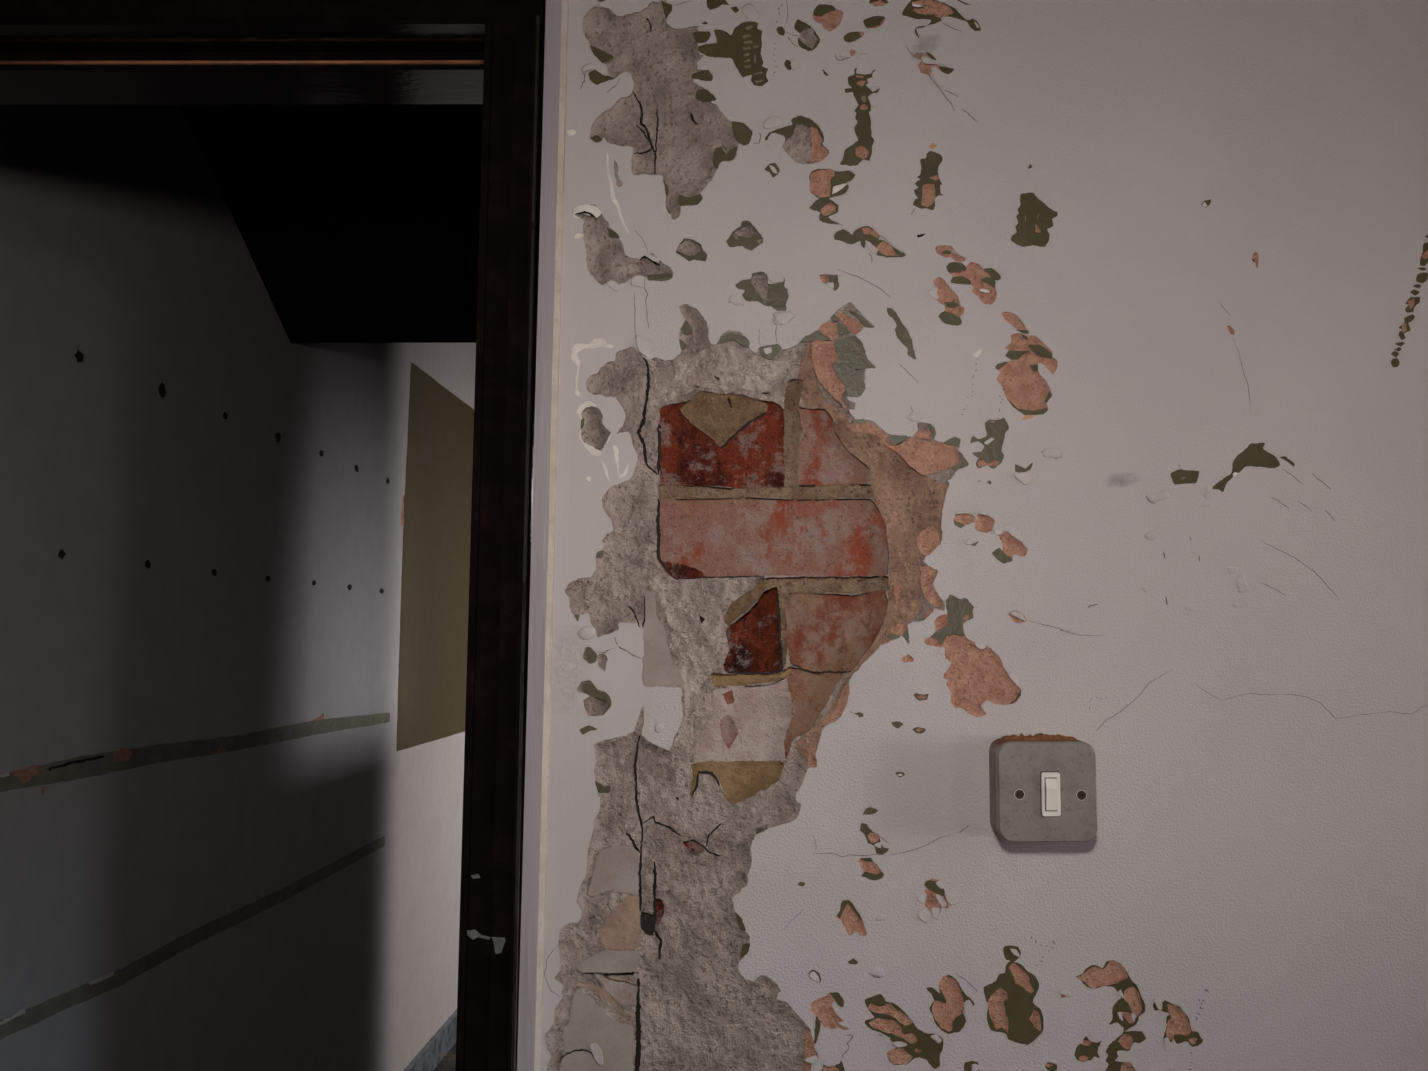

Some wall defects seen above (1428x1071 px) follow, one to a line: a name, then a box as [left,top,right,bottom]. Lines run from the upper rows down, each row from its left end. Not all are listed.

peeling [902,0,981,87]
spalling [567,0,906,258]
spalling [572,204,707,292]
peeling [911,143,943,215]
peeling [1011,193,1058,247]
peeling [1391,235,1428,367]
peeling [1171,443,1295,492]
spalling [545,233,1058,1071]
peeling [1059,960,1203,1071]